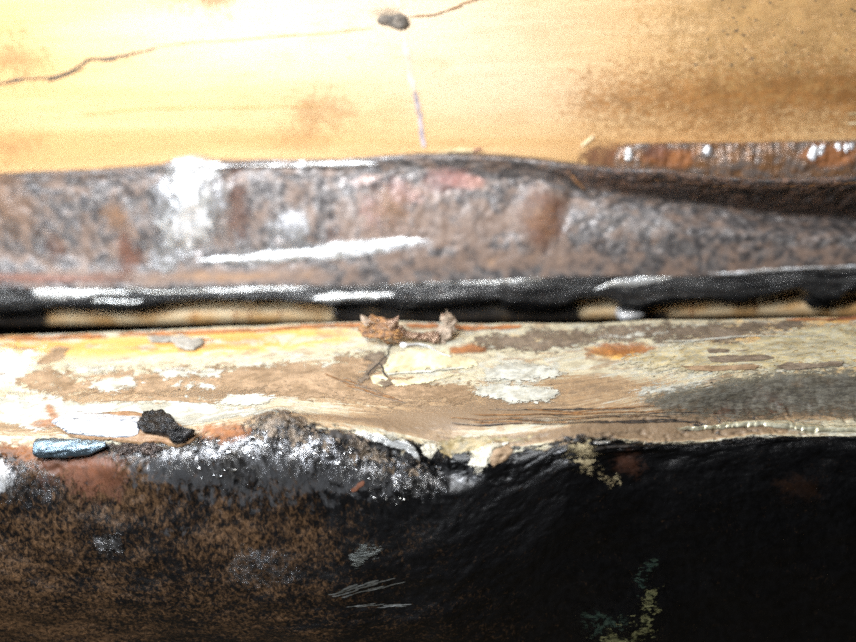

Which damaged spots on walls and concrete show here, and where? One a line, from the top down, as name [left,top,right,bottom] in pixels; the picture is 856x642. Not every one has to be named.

crack [411,0,475,17]
crack [176,33,312,44]
crack [0,47,155,84]
damp [570,8,856,141]
corrosion [0,234,142,286]
peeling [0,319,856,505]